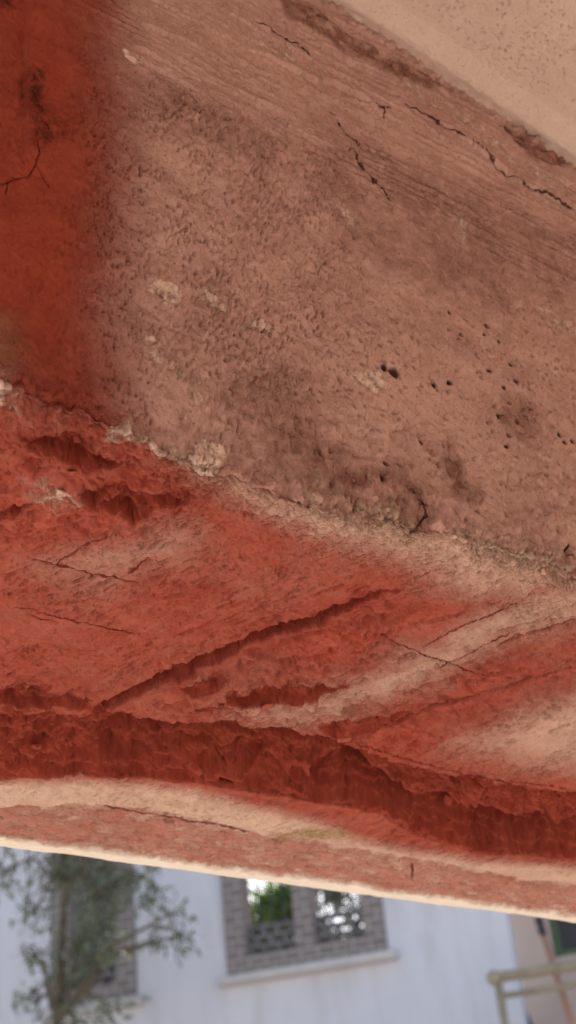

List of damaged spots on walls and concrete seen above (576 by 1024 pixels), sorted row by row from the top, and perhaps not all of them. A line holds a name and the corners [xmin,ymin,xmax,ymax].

crack [257,22,310,56]
crack [329,111,389,200]
crack [369,96,576,213]
spalling [18,431,124,472]
peeling [188,438,227,476]
spalling [74,482,195,528]
crack [33,536,146,583]
crack [384,604,513,679]
spalling [182,672,350,711]
spalling [0,683,576,860]
crack [96,804,246,833]
peeling [0,805,576,916]